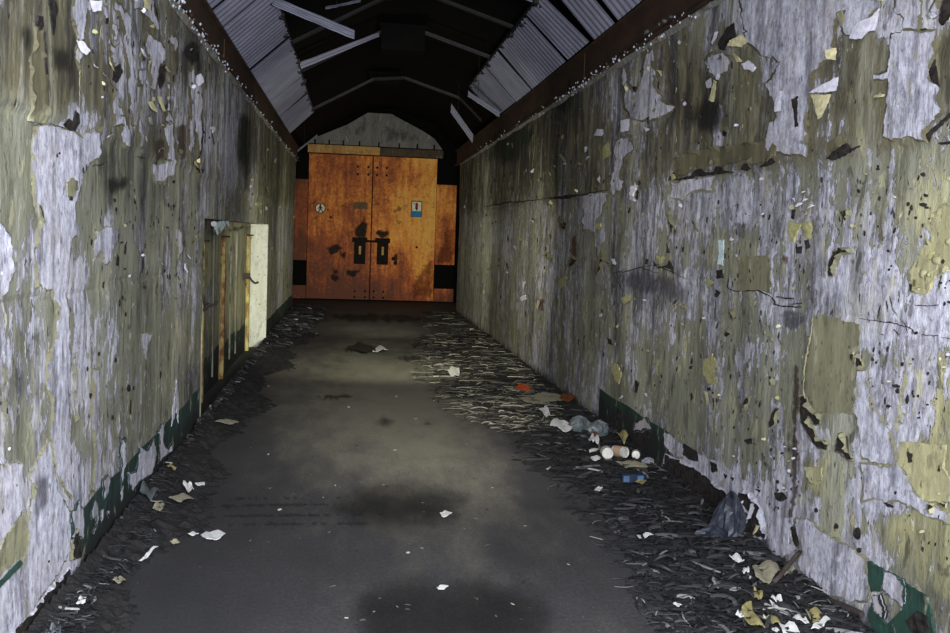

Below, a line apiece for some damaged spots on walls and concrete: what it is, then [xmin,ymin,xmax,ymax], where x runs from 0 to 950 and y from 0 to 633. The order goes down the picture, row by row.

peeling [211,149,294,235]